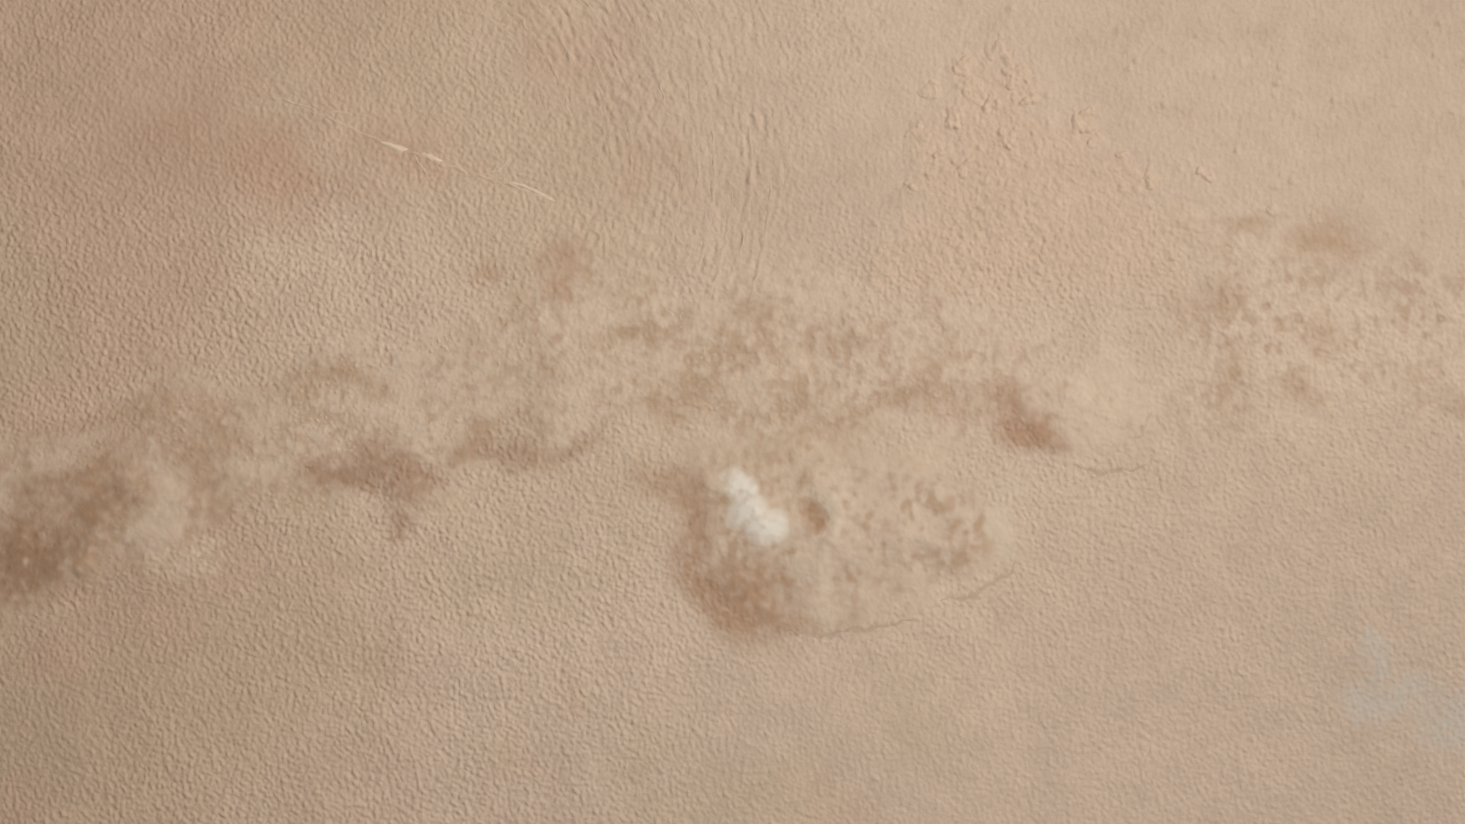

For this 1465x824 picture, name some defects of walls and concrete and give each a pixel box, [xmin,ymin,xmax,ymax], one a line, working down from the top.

leakage [0,127,1076,678]
leakage [1142,198,1465,459]